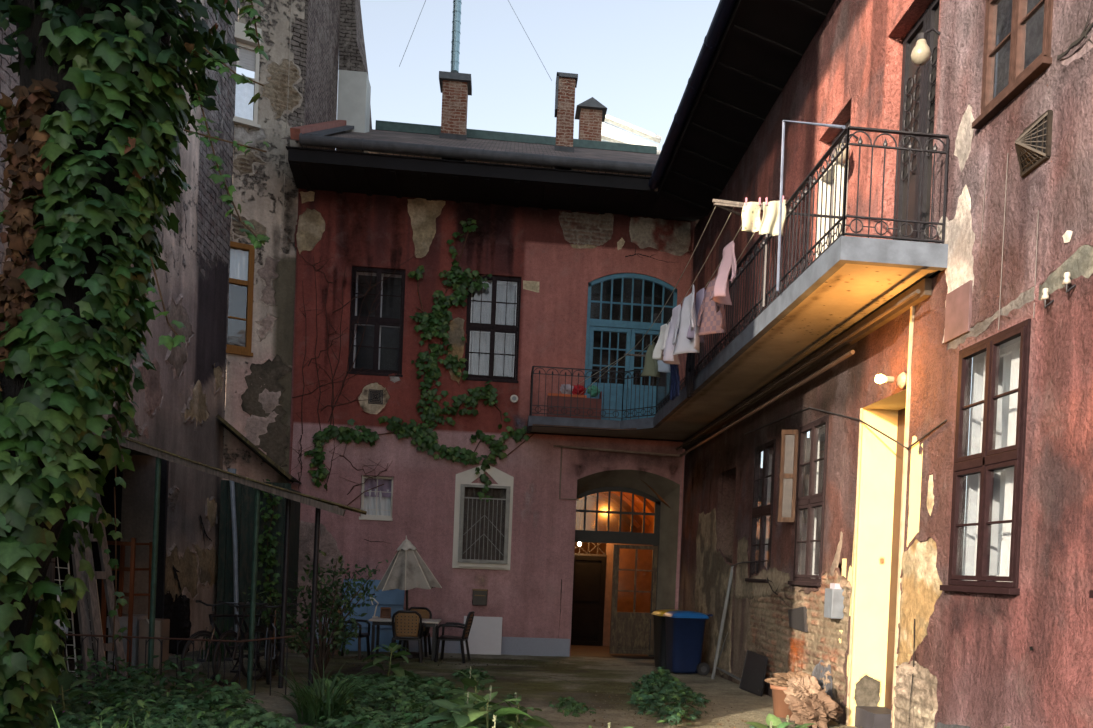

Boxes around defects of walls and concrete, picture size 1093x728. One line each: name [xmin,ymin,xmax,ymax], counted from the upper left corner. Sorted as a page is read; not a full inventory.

flaking render [233,58,303,176]
flaking render [231,213,269,243]
flaking render [294,190,327,256]
flaking render [405,197,447,260]
flaking render [556,209,693,258]
flaking render [255,255,282,340]
flaking render [104,292,223,439]
flaking render [238,354,292,468]
spalling [926,470,938,519]
flaking render [694,503,970,728]